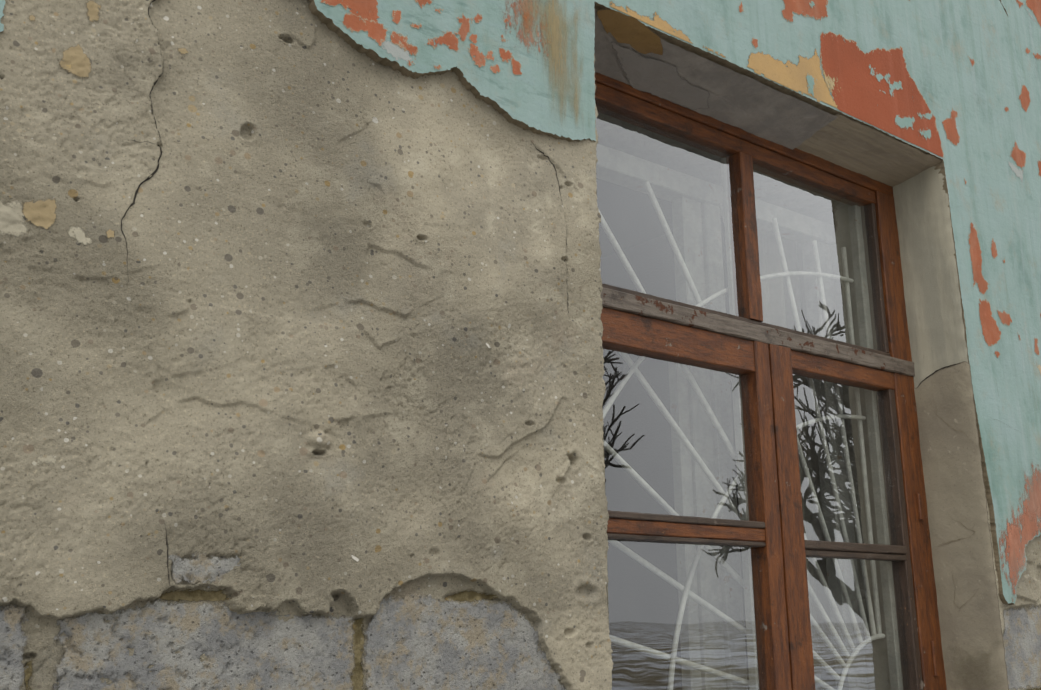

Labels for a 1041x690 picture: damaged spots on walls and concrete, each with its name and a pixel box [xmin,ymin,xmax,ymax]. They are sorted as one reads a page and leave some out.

crack [121,60,164,282]
peeling [747,0,960,158]
peeling [1008,140,1041,180]
peeling [1019,85,1031,112]
peeling [1016,0,1041,27]
flaking render [0,0,613,690]
peeling [968,222,1021,358]